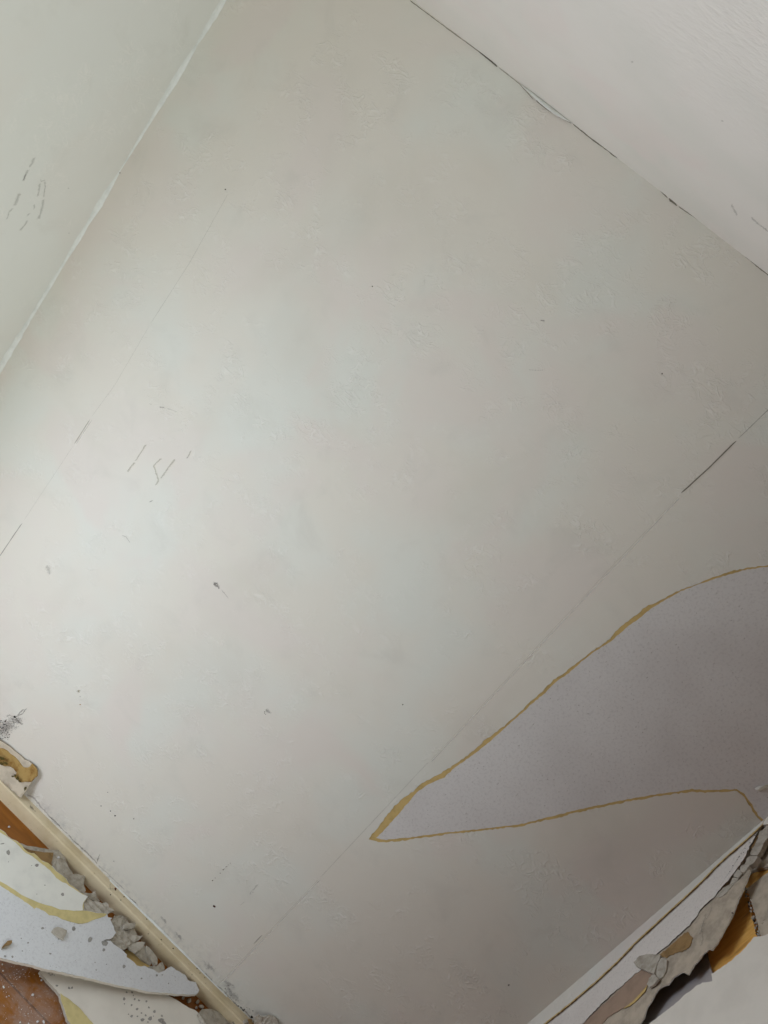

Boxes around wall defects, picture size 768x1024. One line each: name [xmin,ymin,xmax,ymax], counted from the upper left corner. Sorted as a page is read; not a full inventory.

crack [410,0,617,158]
peeling [369,565,768,898]
peeling [634,954,668,988]